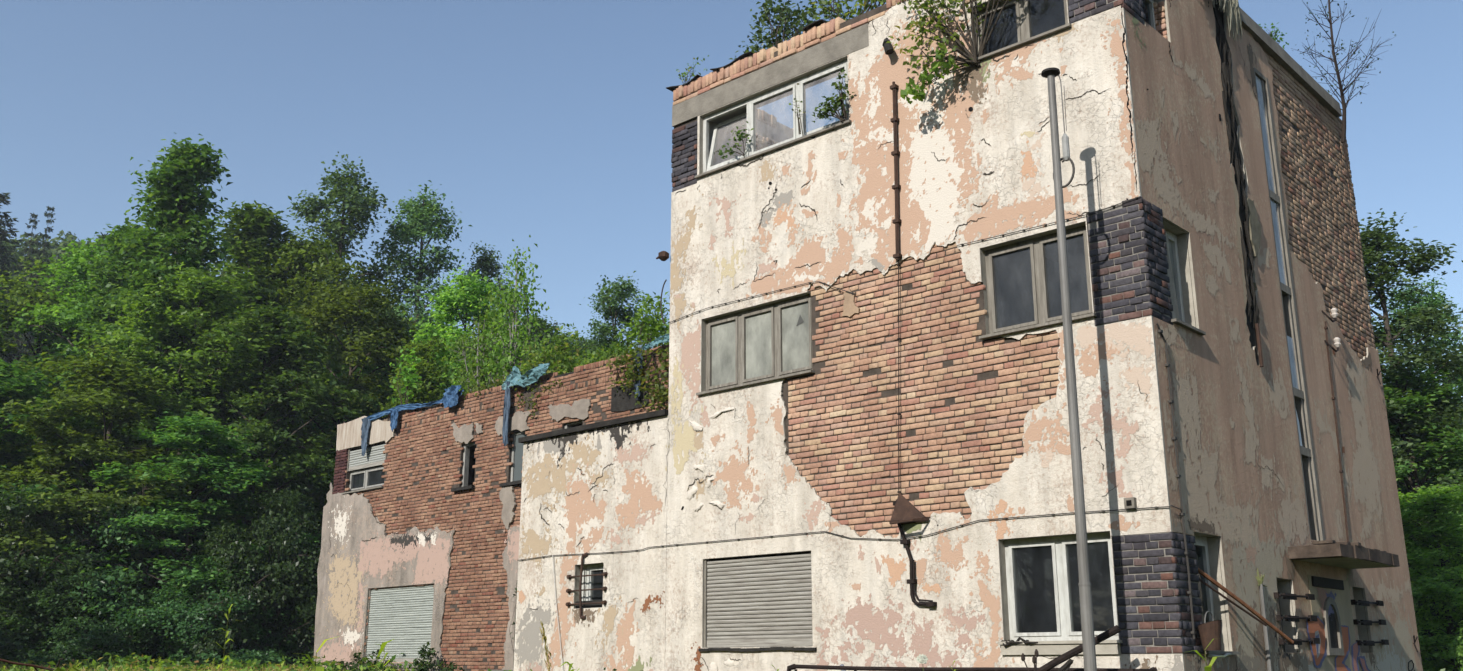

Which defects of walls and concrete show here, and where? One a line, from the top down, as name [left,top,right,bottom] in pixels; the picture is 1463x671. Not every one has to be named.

crack [954,138,994,239]
crack [991,5,1137,189]
flaking render [672,12,1154,671]
peeling [319,532,451,668]
peeling [507,441,663,671]